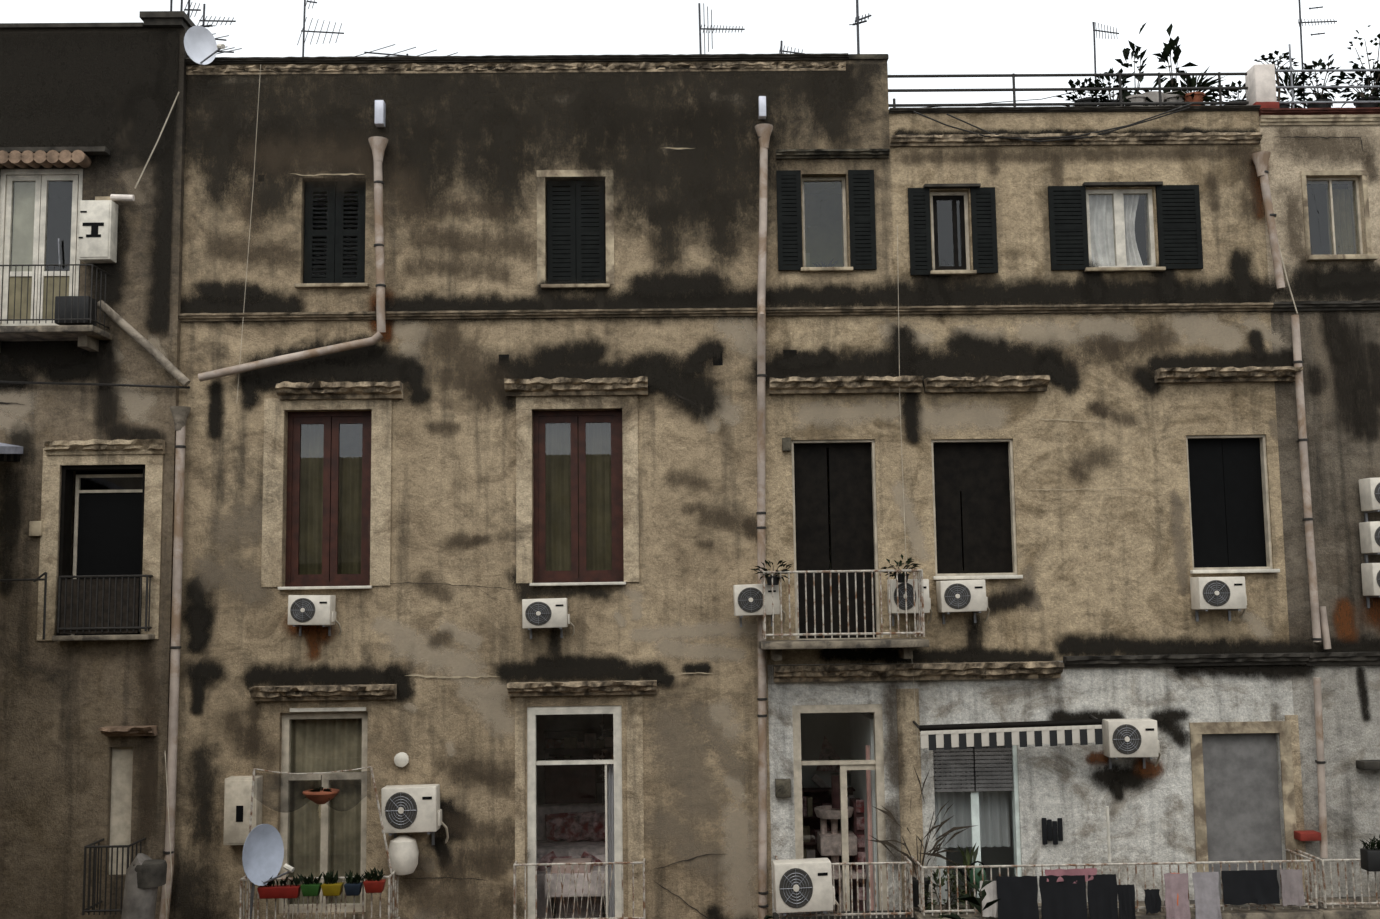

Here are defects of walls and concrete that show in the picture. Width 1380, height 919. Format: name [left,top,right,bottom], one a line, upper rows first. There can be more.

leakage [0,29,1380,444]
leakage [508,569,609,601]
leakage [183,575,226,715]
rust [285,617,332,660]
leakage [496,629,711,688]
leakage [818,587,1380,721]
leakage [225,663,414,764]
leakage [883,682,904,786]
rust [1086,751,1109,764]
leakage [1091,763,1150,801]
rust [1135,758,1164,778]
leakage [1150,708,1191,747]